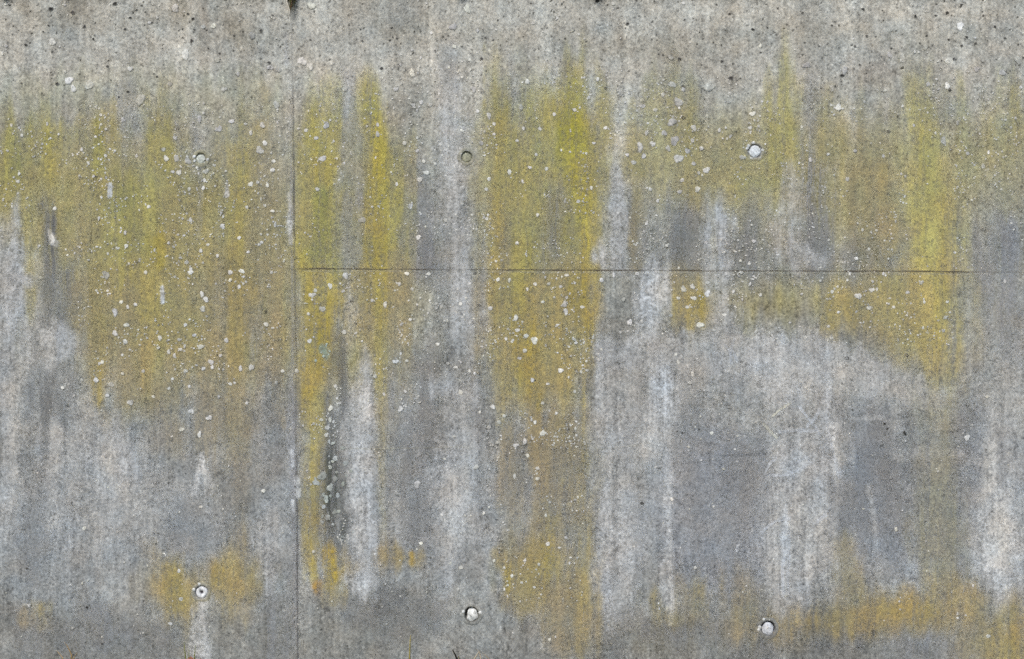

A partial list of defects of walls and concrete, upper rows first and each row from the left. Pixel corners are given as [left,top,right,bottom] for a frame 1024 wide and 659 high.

water stain [0,184,145,528]
water stain [287,116,437,640]
water stain [391,369,480,585]
water stain [407,59,484,337]
water stain [509,105,911,652]